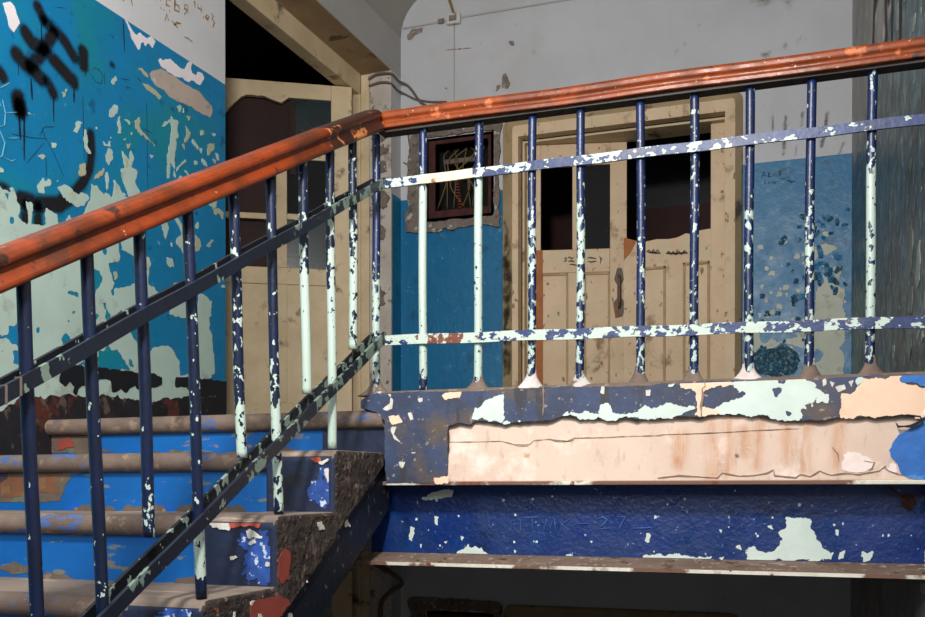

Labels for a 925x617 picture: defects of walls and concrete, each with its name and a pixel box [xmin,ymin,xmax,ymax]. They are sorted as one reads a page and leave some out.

spalling [139,58,219,179]
peeling [0,104,155,245]
spalling [404,123,503,233]
peeling [0,287,19,377]
peeling [31,260,83,360]
peeling [34,374,86,399]
peeling [94,237,135,325]
peeling [150,346,189,402]
peeling [563,328,925,480]
crack [658,447,901,478]
peeling [210,523,293,617]
peeling [640,503,845,561]